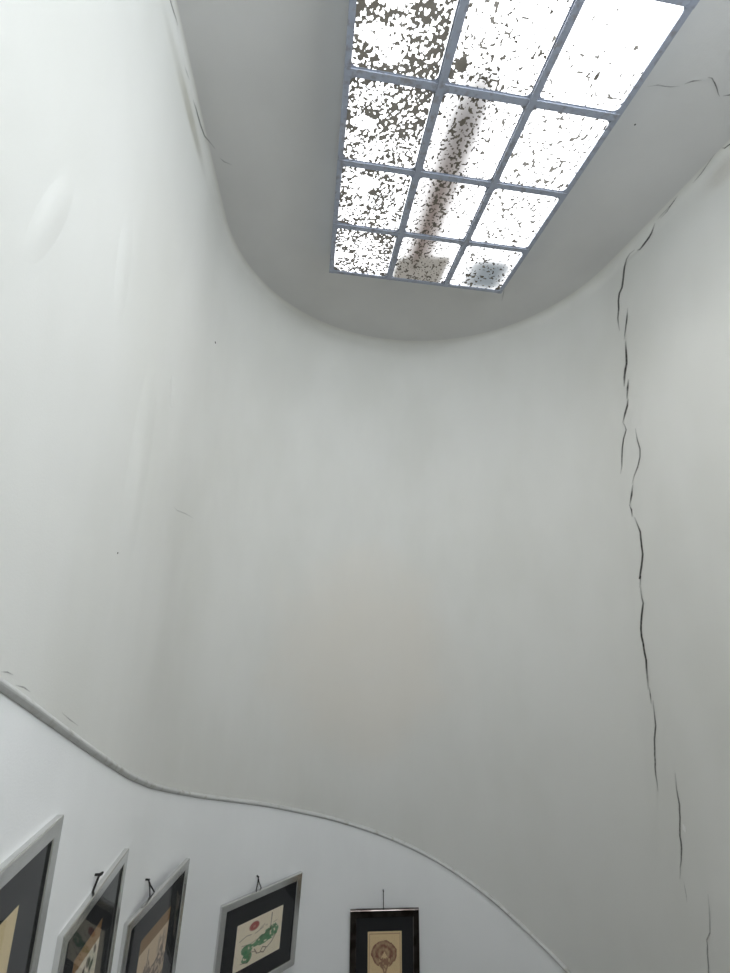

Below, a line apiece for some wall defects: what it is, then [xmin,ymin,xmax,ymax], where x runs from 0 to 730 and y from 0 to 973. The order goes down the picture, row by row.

crack [617,229,656,776]
crack [675,796,683,860]